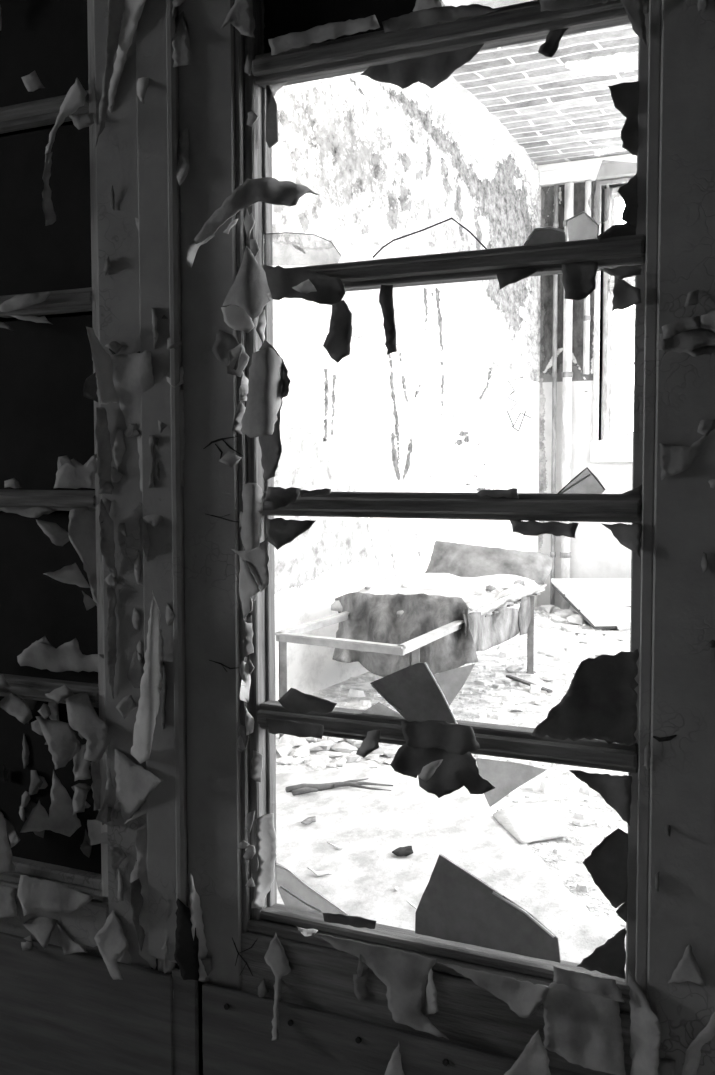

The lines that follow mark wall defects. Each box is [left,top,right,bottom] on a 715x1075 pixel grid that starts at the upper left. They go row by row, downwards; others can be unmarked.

peeling [278,100,423,230]
peeling [0,292,53,331]
peeling [657,289,715,357]
flaking render [185,171,519,783]
peeling [601,523,642,557]
peeling [622,484,642,497]
peeling [0,308,185,980]
peeling [390,720,495,798]
peeling [190,873,212,983]
peeling [297,770,715,1075]
peeling [258,933,292,1041]